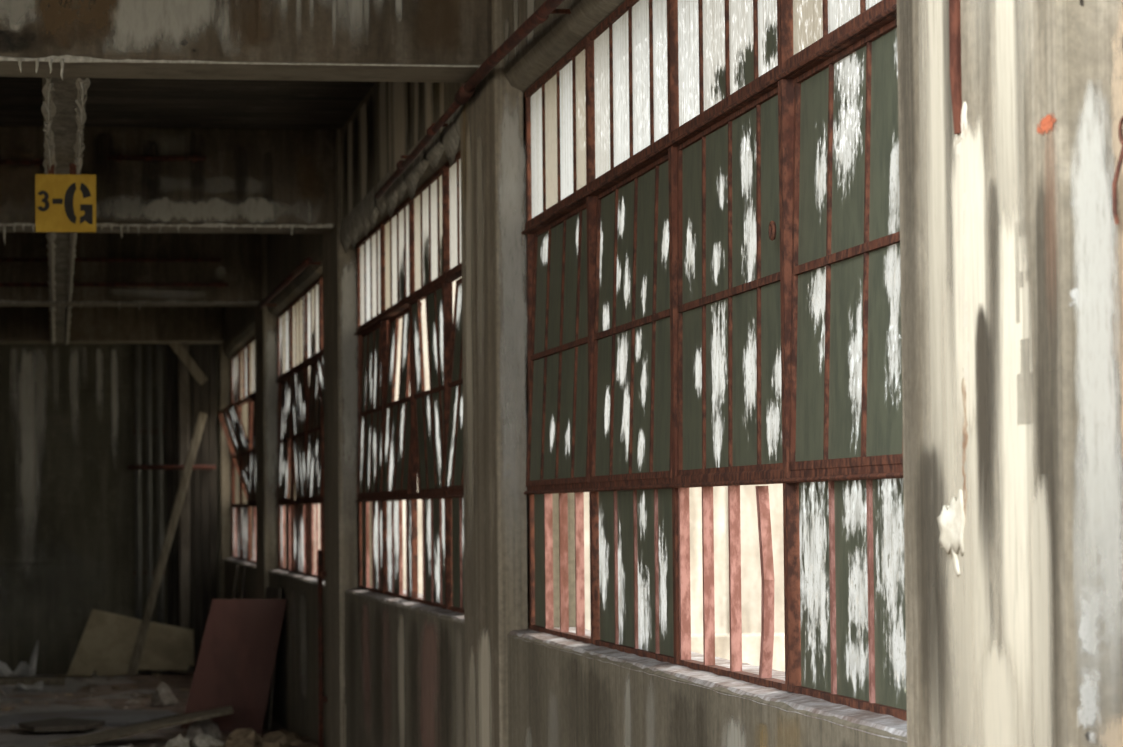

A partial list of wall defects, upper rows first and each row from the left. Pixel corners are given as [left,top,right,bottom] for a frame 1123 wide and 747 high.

leakage [0,0,480,68]
leakage [0,78,57,205]
leakage [73,78,114,175]
leakage [96,82,444,228]
corrosion [1037,114,1056,135]
leakage [465,128,483,458]
leakage [0,232,260,535]
leakage [900,0,1057,747]
leakage [1071,87,1123,652]
leakage [469,627,492,747]
leakage [727,719,746,747]
leakage [1078,670,1100,741]